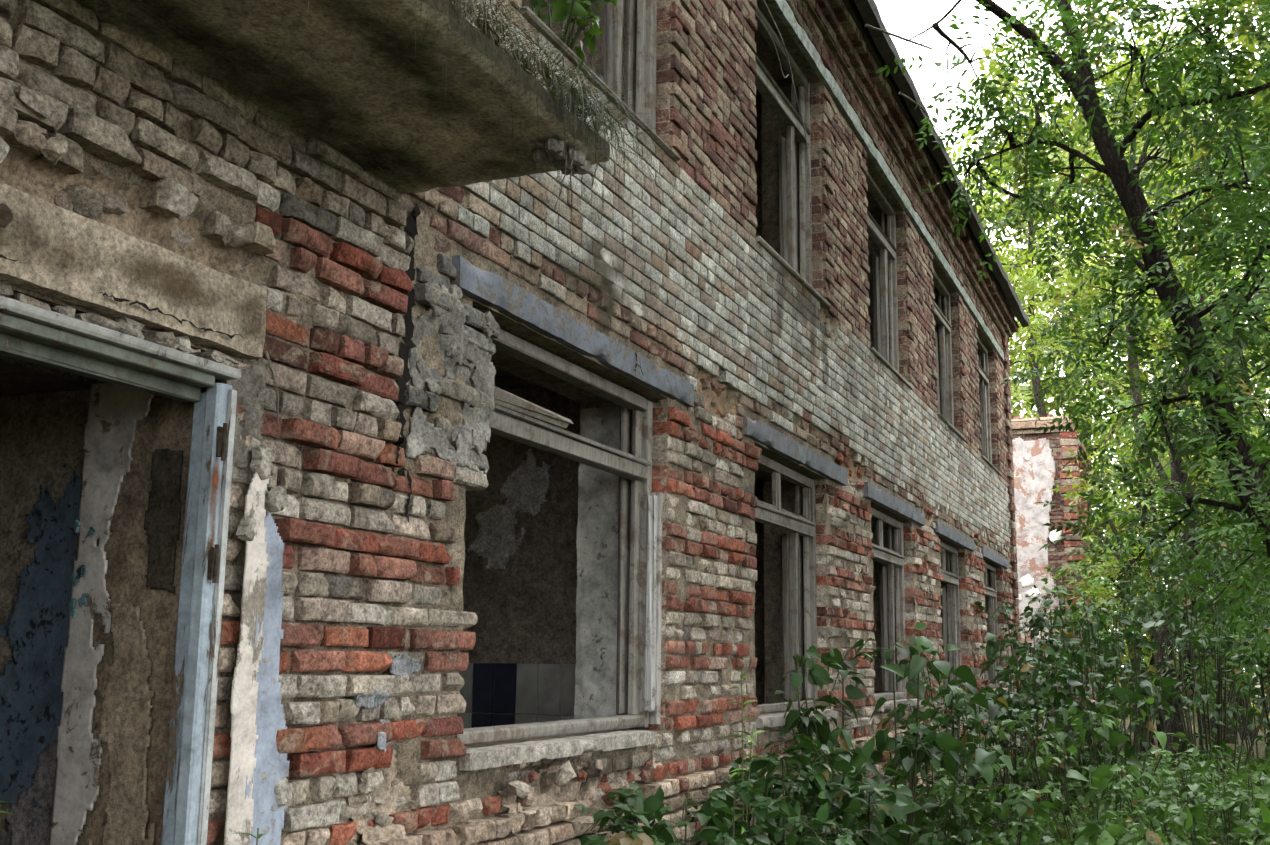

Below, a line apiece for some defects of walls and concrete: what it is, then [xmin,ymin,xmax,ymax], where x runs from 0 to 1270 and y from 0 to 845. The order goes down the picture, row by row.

peeling [0,381,193,845]
crack [99,292,244,339]
peeling [224,357,292,845]
crack [383,203,431,522]
flaking render [405,282,497,474]
peeling [467,449,550,569]